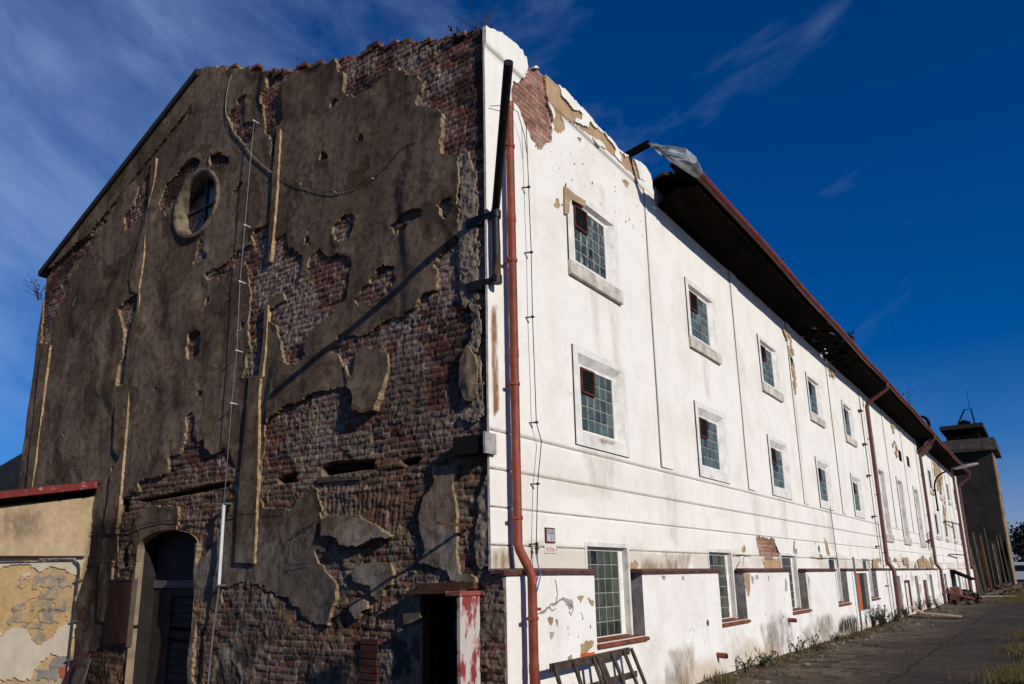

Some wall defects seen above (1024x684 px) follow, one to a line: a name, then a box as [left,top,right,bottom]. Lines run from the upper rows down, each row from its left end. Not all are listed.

flaking render [511,68,645,188]
flaking render [126,153,229,229]
flaking render [553,185,586,214]
flaking render [192,30,507,684]
flaking render [783,327,797,395]
flaking render [114,412,239,579]
flaking render [742,535,787,596]
flaking render [0,559,85,681]
flaking render [84,622,128,684]
peeling [538,579,594,639]
peeling [568,640,594,660]